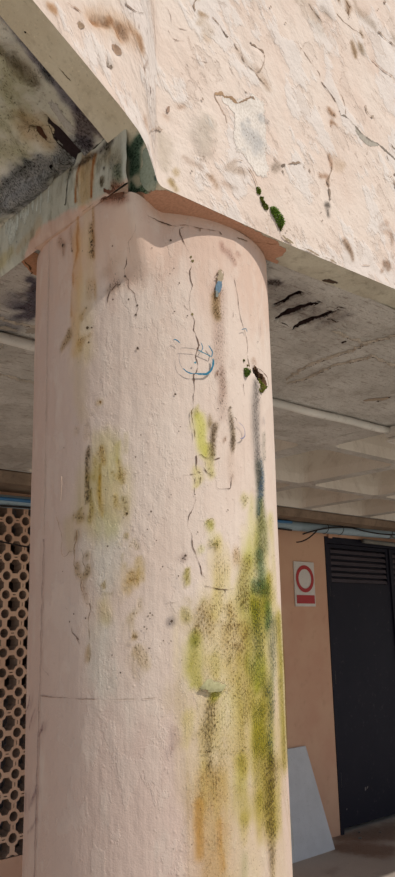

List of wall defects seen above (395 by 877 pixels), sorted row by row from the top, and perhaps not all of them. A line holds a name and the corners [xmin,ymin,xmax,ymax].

water stain [0,99,113,246]
crack [213,17,269,94]
peeling [215,91,270,178]
crack [239,155,336,221]
crack [300,47,395,187]
crack [309,0,393,44]
crack [107,216,336,404]
crack [188,454,234,592]